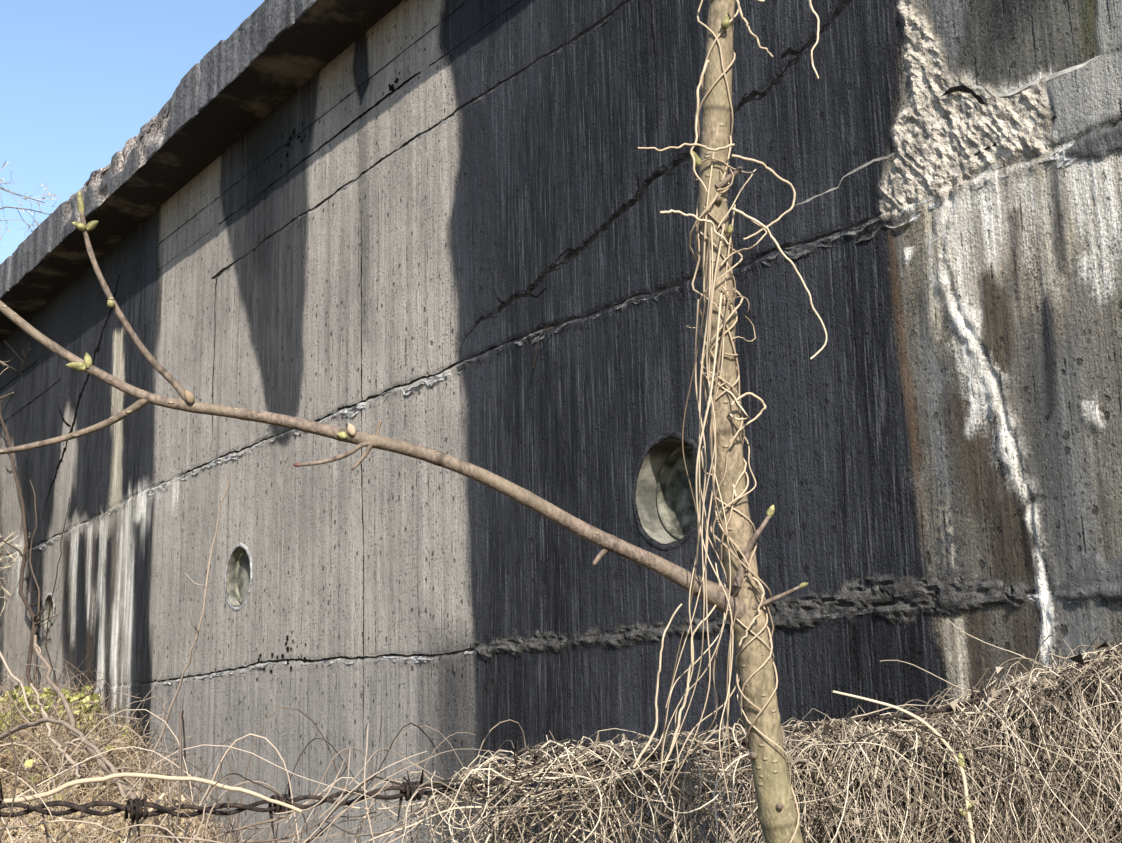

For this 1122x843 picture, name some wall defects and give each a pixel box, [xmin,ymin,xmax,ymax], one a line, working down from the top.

crack [461,146,700,346]
crack [733,0,851,119]
crack [795,152,897,206]
spalling [879,0,1122,217]
damp [0,207,161,762]
damp [433,0,762,843]
damp [727,0,1122,747]